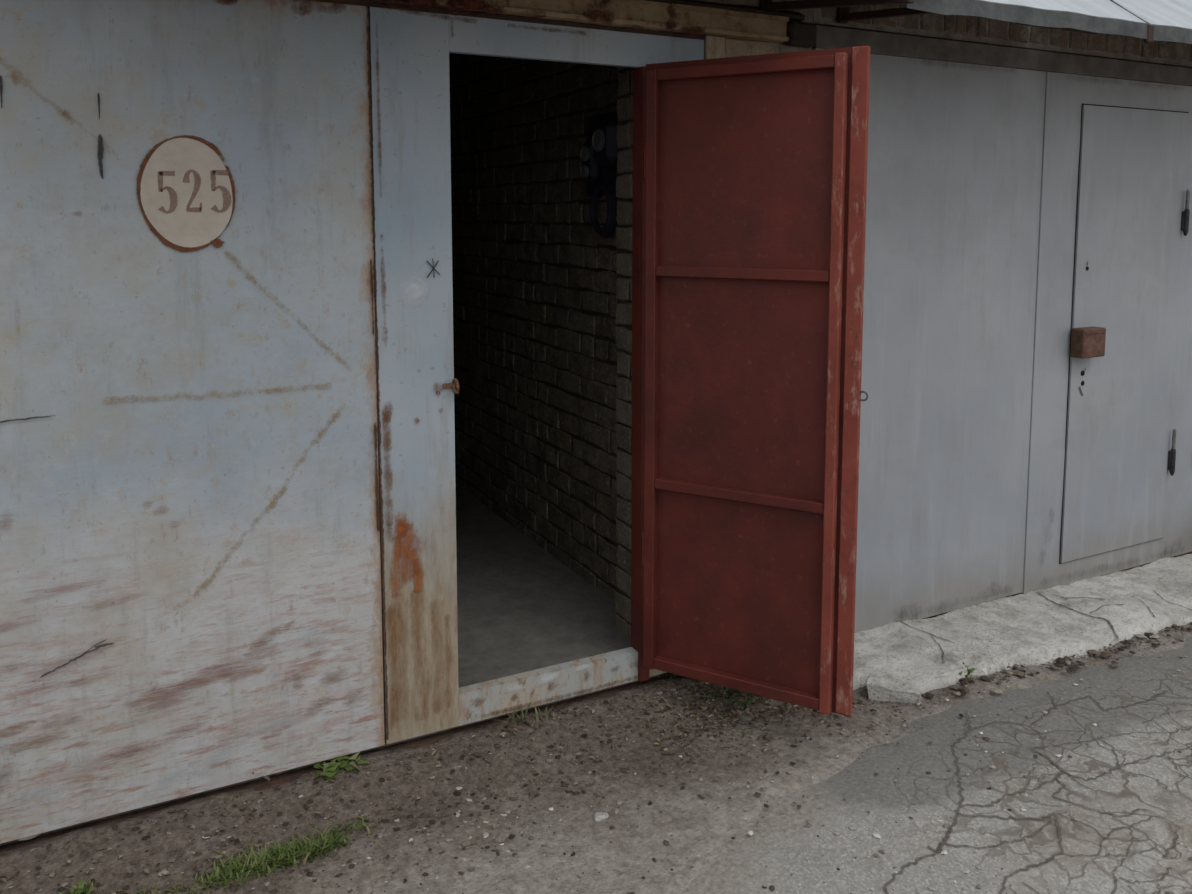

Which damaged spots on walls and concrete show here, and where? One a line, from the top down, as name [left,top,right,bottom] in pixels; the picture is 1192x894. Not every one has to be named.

corrosion [366,6,423,740]
crack [927,691,1192,894]